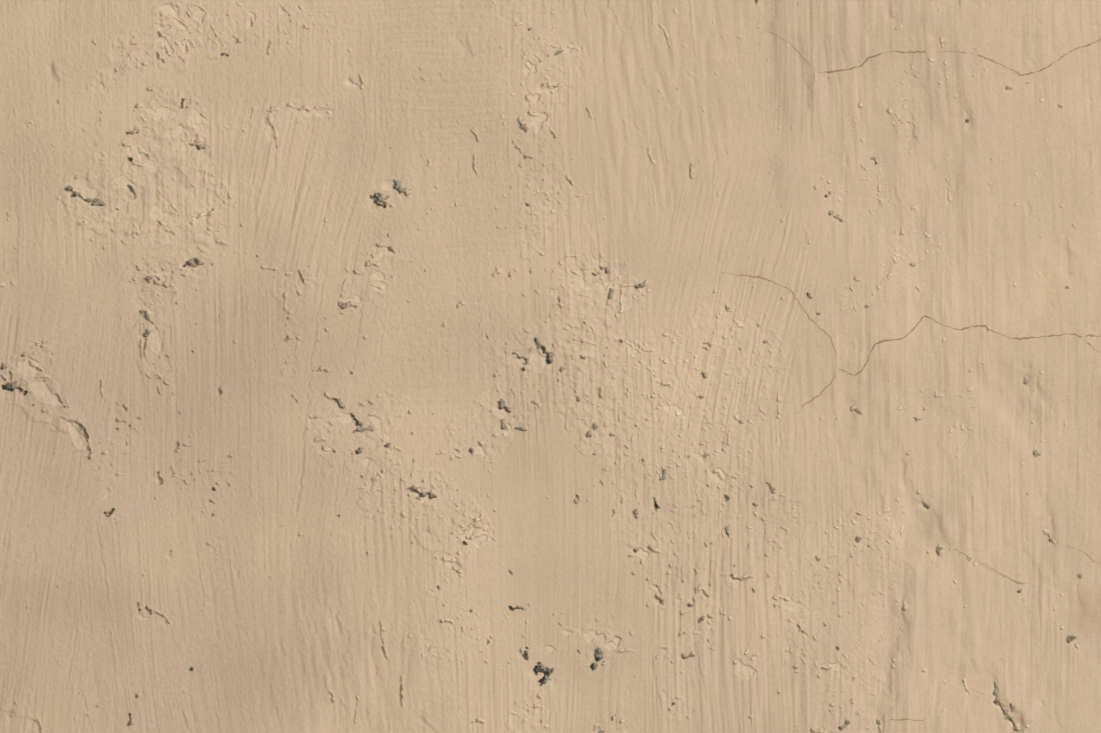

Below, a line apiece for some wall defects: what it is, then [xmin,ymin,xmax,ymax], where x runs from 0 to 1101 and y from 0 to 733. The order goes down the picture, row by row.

spalling [142,0,232,76]
crack [765,29,1101,84]
peeling [370,180,412,203]
spalling [0,339,94,462]
spalling [119,244,218,383]
spalling [440,250,646,477]
crack [723,271,1101,413]
crack [948,546,1032,586]
spalling [525,647,554,686]
peeling [585,631,621,670]